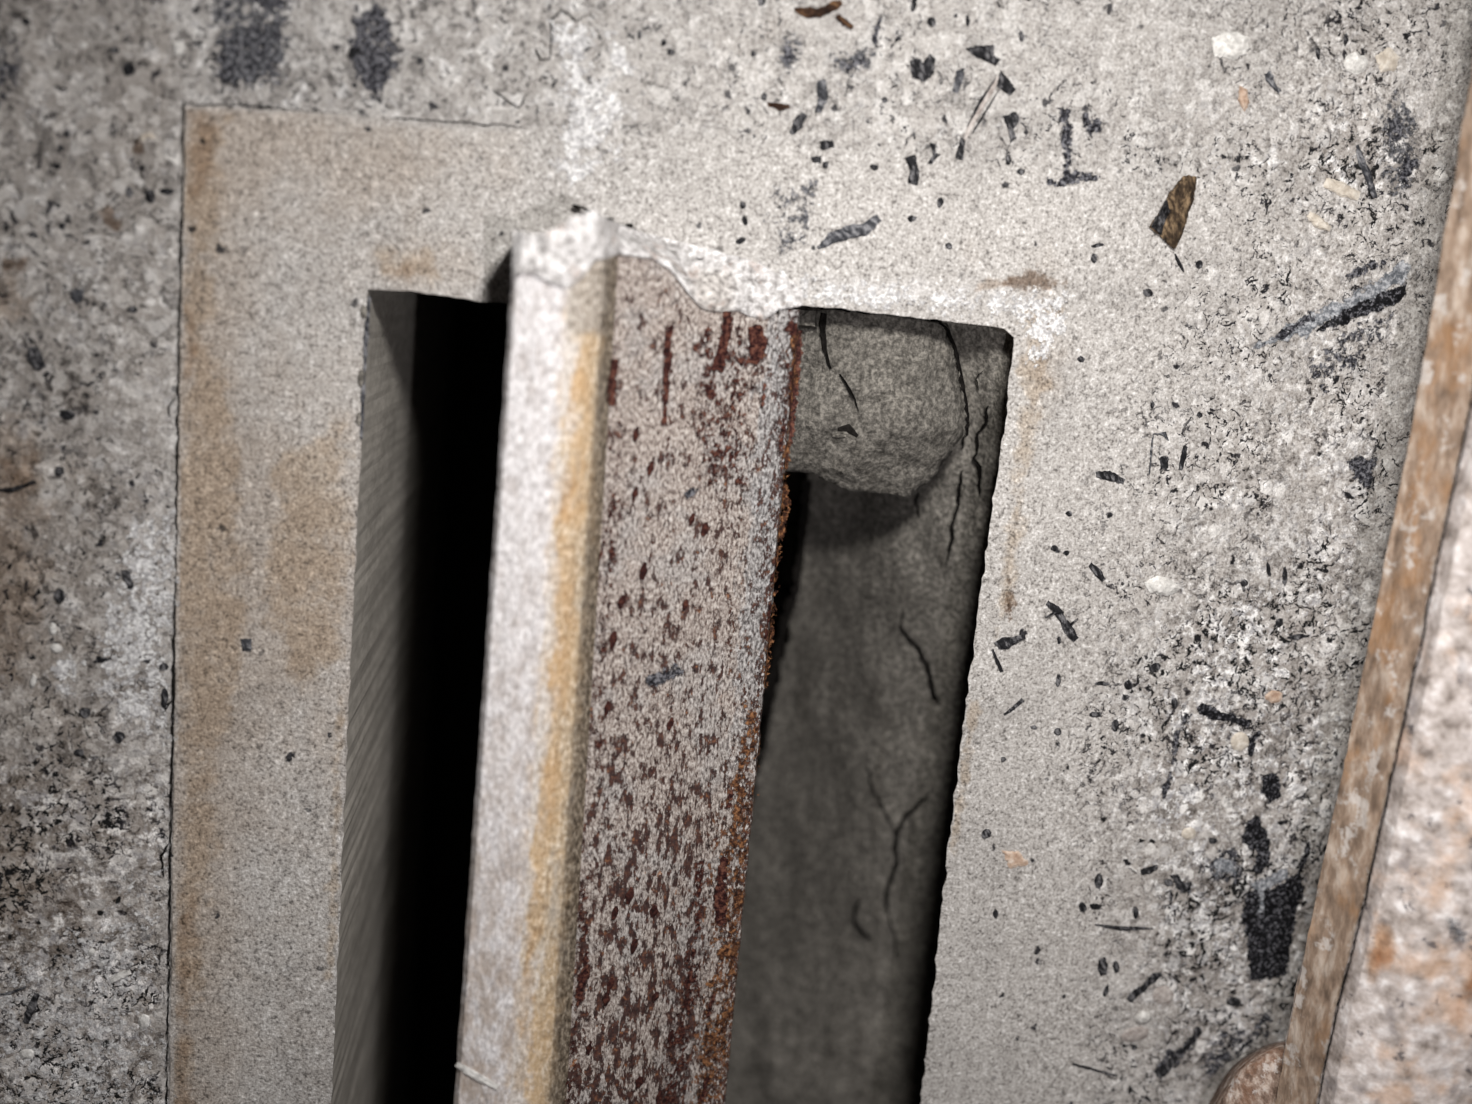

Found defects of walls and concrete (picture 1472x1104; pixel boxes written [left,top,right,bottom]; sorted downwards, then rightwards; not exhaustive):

corrosion [590,359,628,759]
corrosion [657,311,803,688]
crack [899,607,939,703]
crack [915,319,989,563]
corrosion [564,869,595,1104]
corrosion [659,700,763,1104]
crack [853,761,929,958]